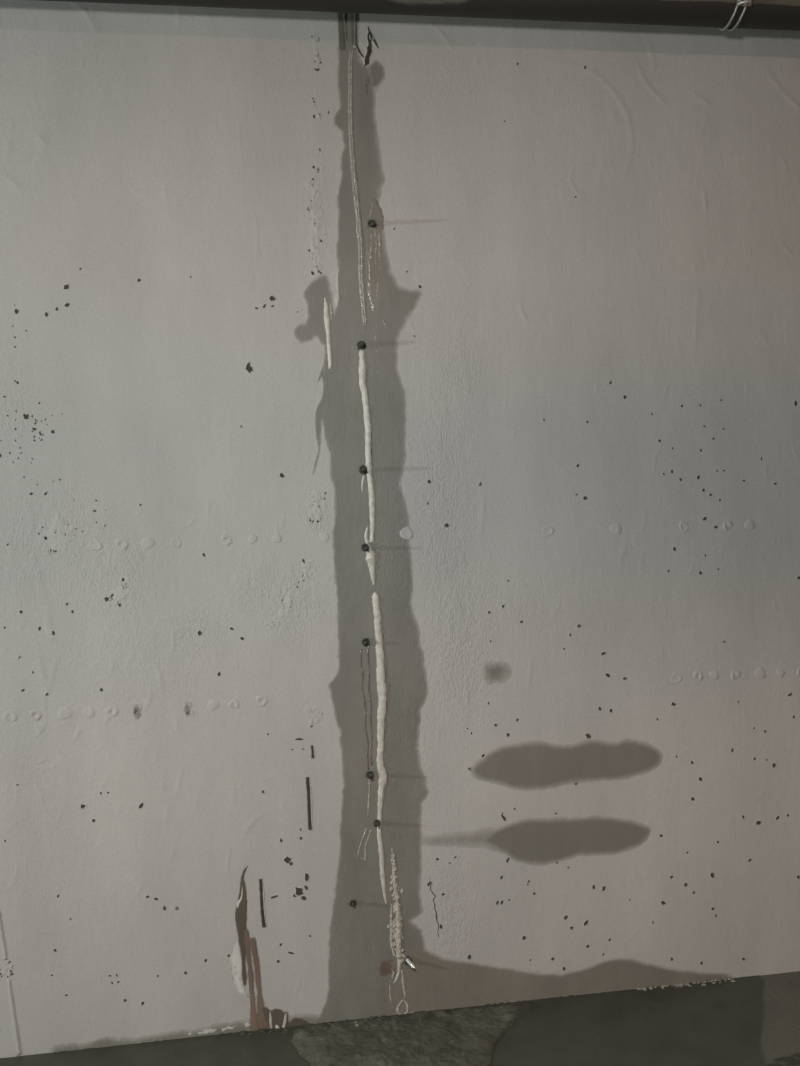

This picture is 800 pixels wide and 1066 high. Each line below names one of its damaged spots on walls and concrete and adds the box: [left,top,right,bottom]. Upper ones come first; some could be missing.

crack [348,26,390,916]
peeling [229,942,251,1000]